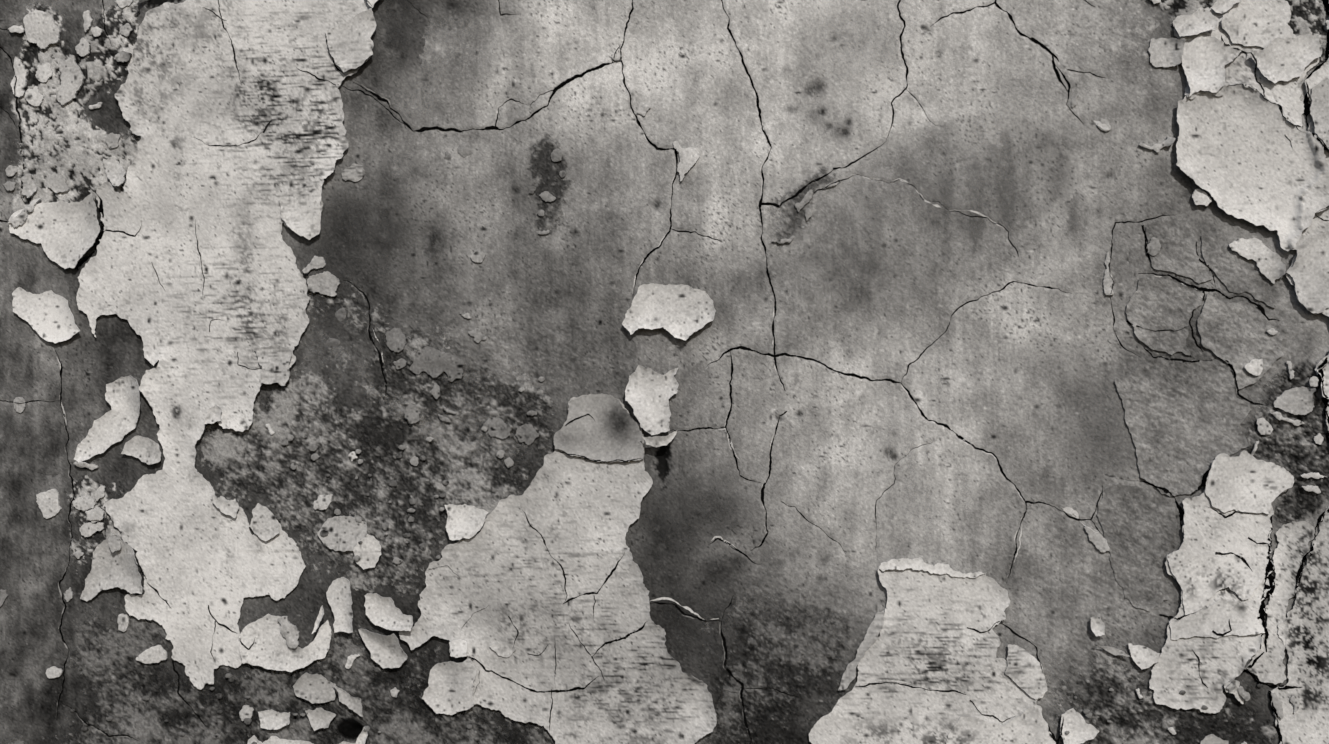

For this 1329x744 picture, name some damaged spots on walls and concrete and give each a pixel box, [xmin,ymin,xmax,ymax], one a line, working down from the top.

crack [0,28,25,223]
crack [296,0,722,298]
peeling [1072,0,1329,317]
crack [343,280,387,399]
peeling [3,0,1056,744]
crack [558,414,641,463]
crack [461,505,797,744]
crack [670,0,1329,744]
peeling [1048,277,1329,744]